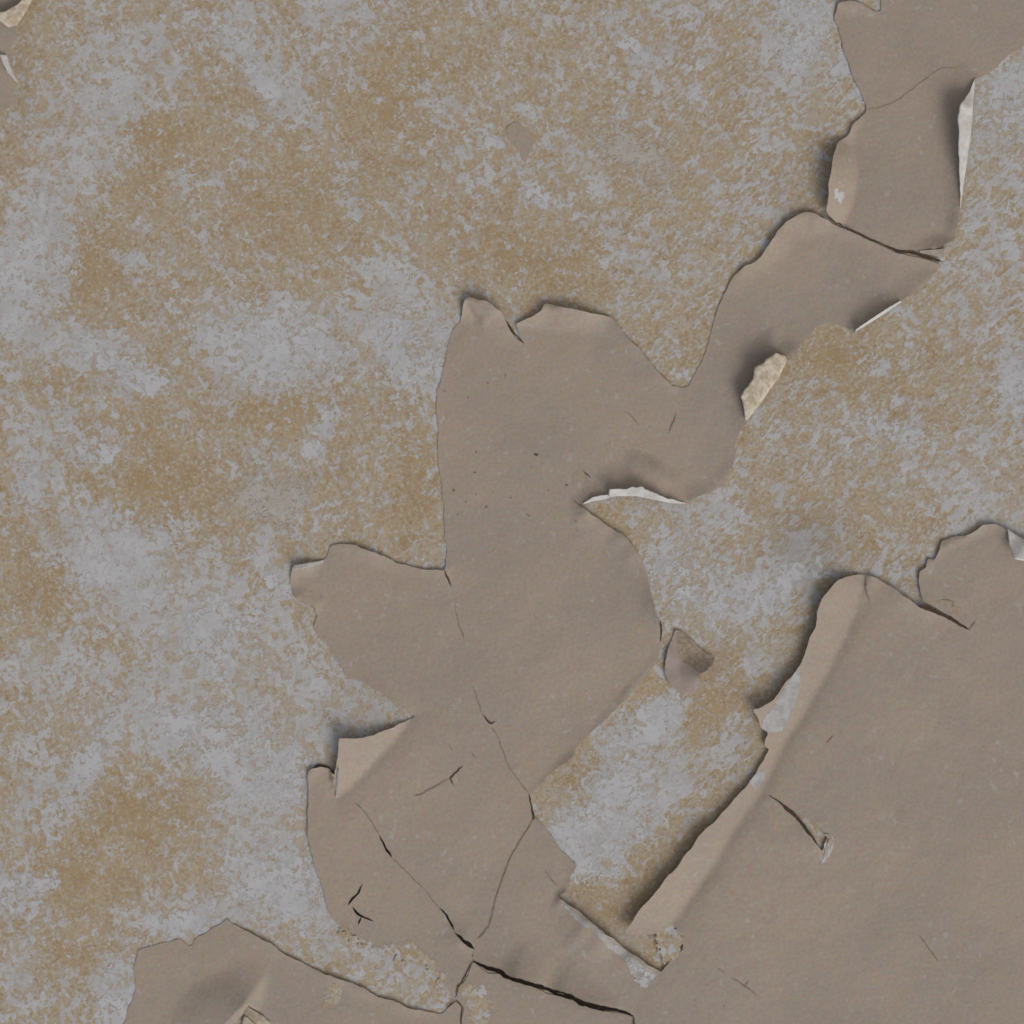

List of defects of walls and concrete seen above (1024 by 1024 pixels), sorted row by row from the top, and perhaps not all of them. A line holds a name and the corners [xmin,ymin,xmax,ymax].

peeling [826,0,1024,258]
peeling [124,212,1024,1024]
crack [348,884,372,925]
crack [356,689,634,1024]
crack [769,795,818,845]